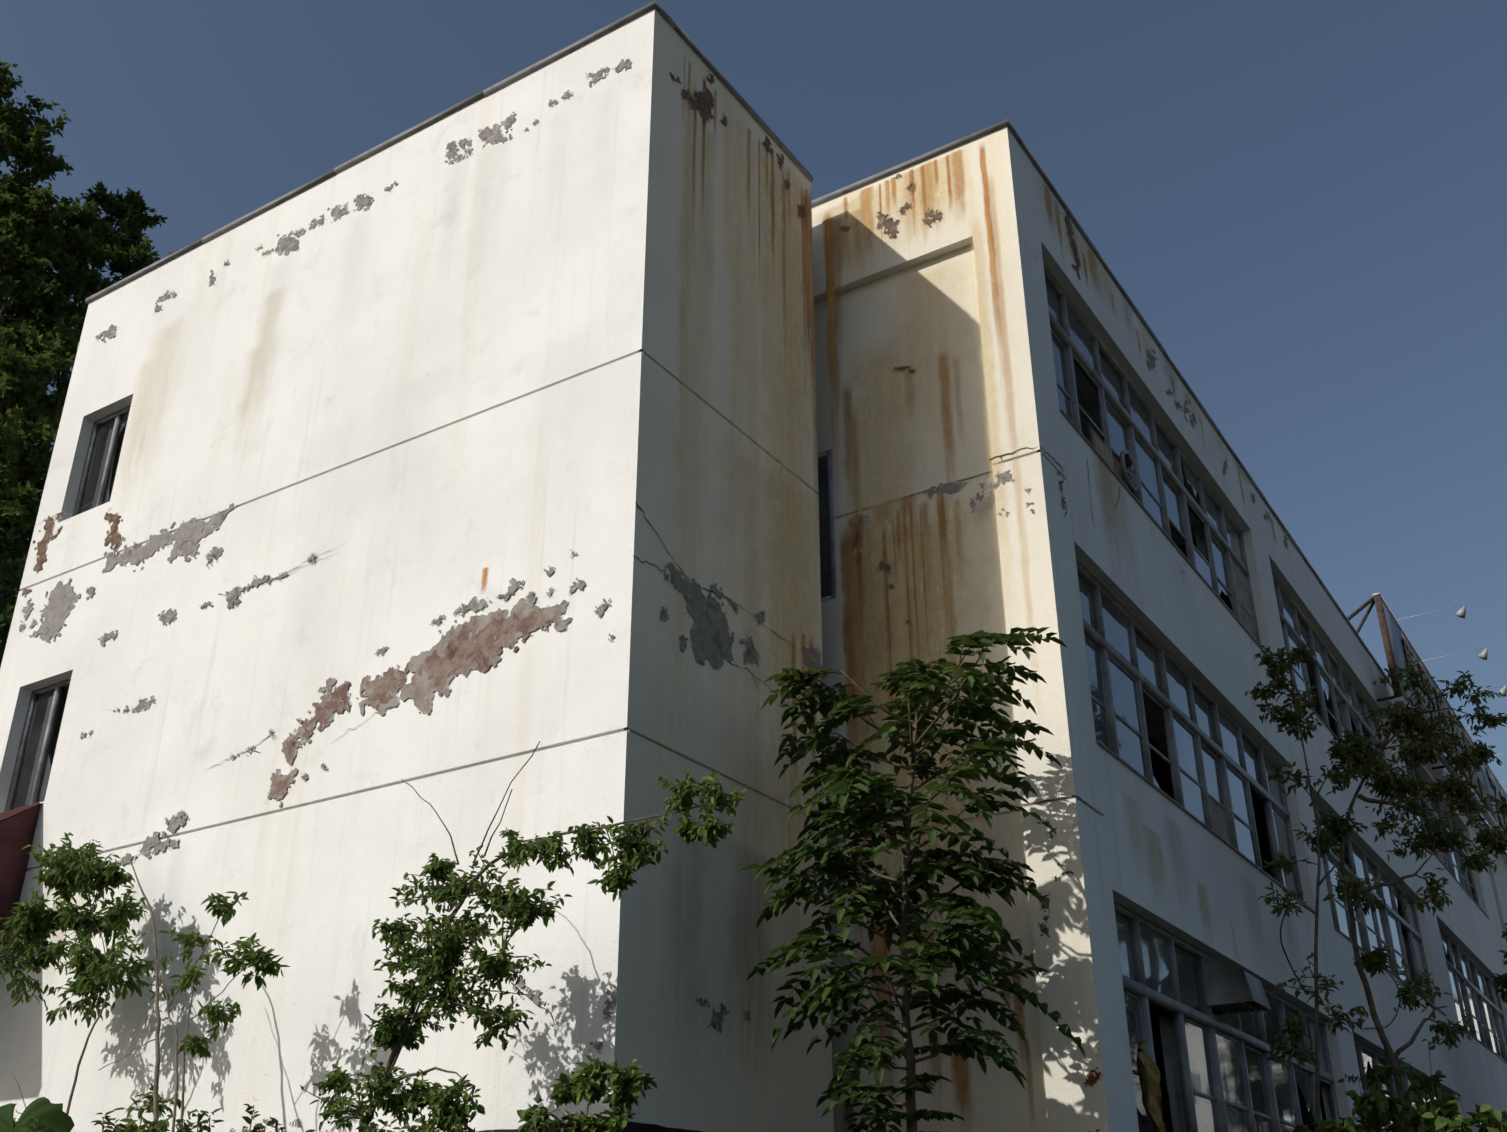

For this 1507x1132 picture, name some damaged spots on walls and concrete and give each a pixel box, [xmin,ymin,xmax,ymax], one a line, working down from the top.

peeling [444,89,573,164]
peeling [255,181,398,257]
corrosion [759,144,774,248]
corrosion [844,151,963,246]
flaking render [876,174,944,239]
corrosion [980,149,998,300]
corrosion [803,195,851,461]
corrosion [940,356,950,436]
flaking render [19,503,235,643]
peeling [199,571,288,609]
peeling [230,565,585,807]
corrosion [856,509,926,809]